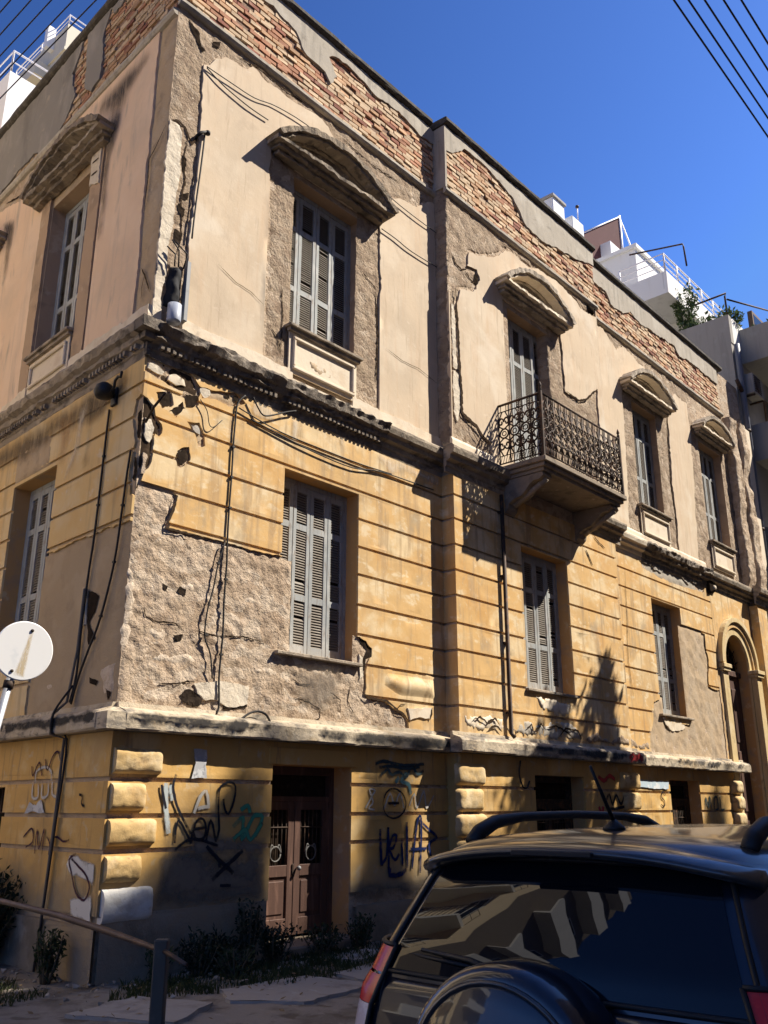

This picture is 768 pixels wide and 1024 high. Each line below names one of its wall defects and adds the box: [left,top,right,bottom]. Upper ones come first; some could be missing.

spalling [136,7,711,568]
spalling [27,363,433,728]
spalling [464,626,731,759]